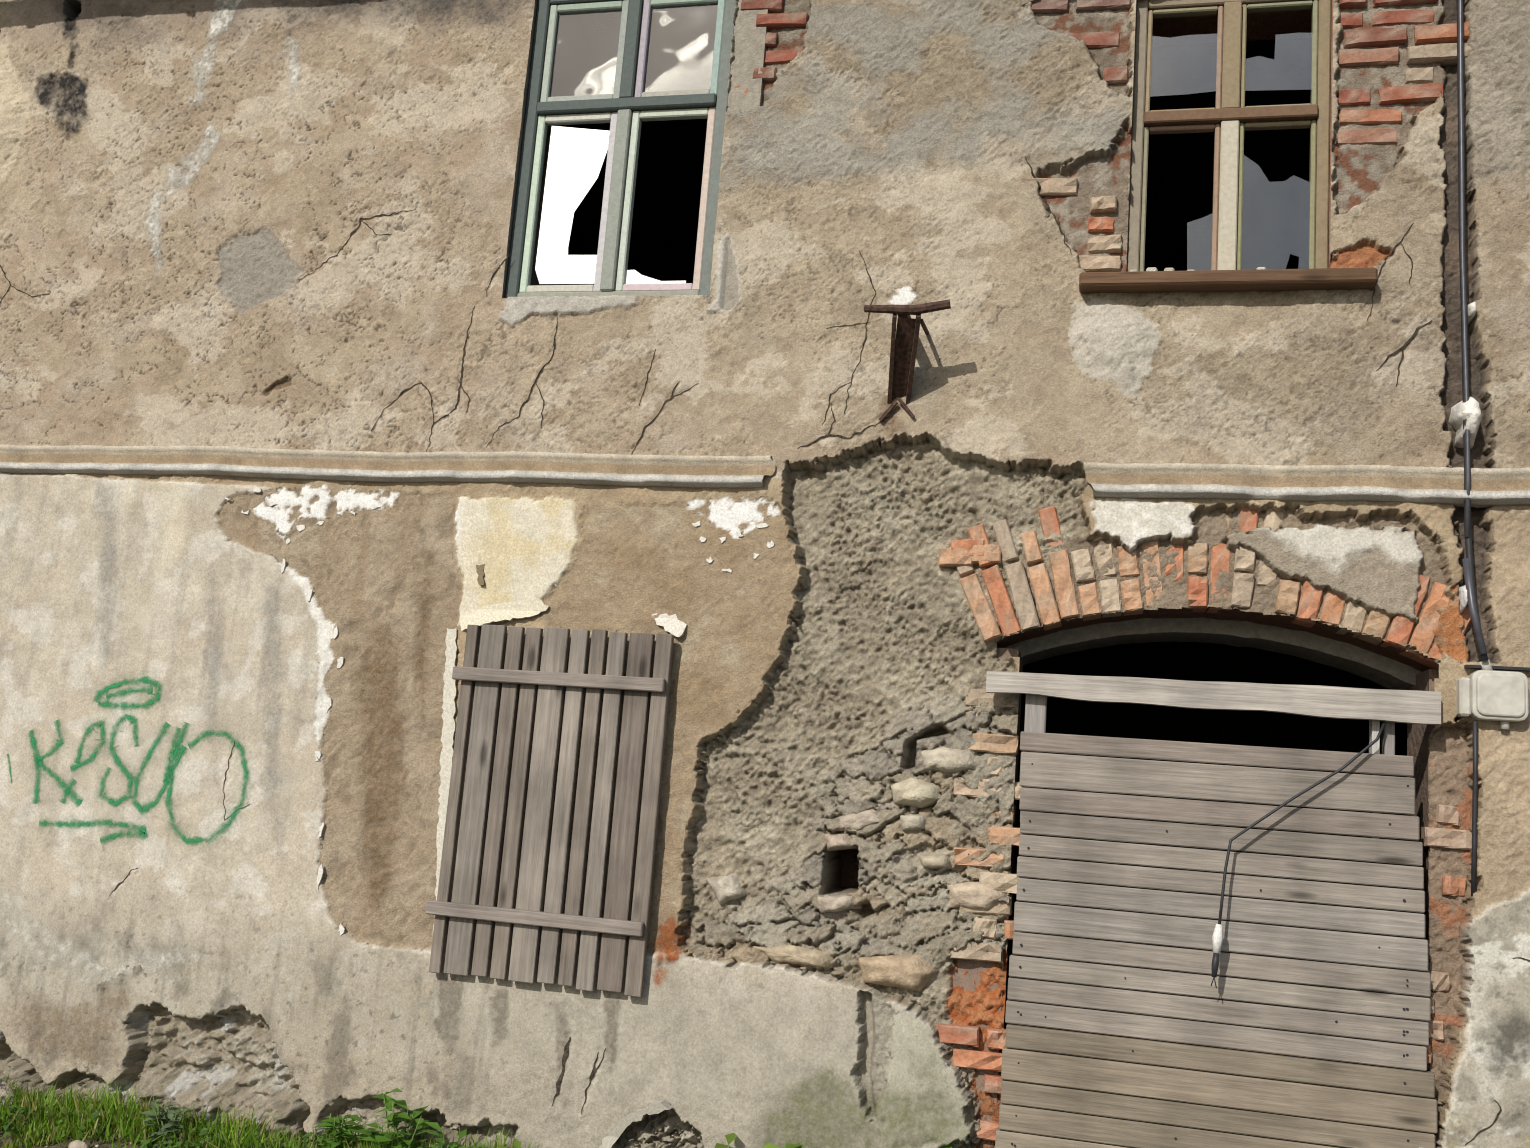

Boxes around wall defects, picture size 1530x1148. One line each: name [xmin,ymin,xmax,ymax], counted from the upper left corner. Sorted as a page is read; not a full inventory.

flaking render [734,0,812,106]
flaking render [1027,0,1134,97]
flaking render [1332,0,1472,214]
flaking render [1021,119,1132,272]
flaking render [1329,239,1394,268]
crack [371,254,558,452]
crack [631,349,699,454]
flaking render [218,433,1470,1148]
spalling [0,1001,519,1148]
crack [552,1037,606,1114]